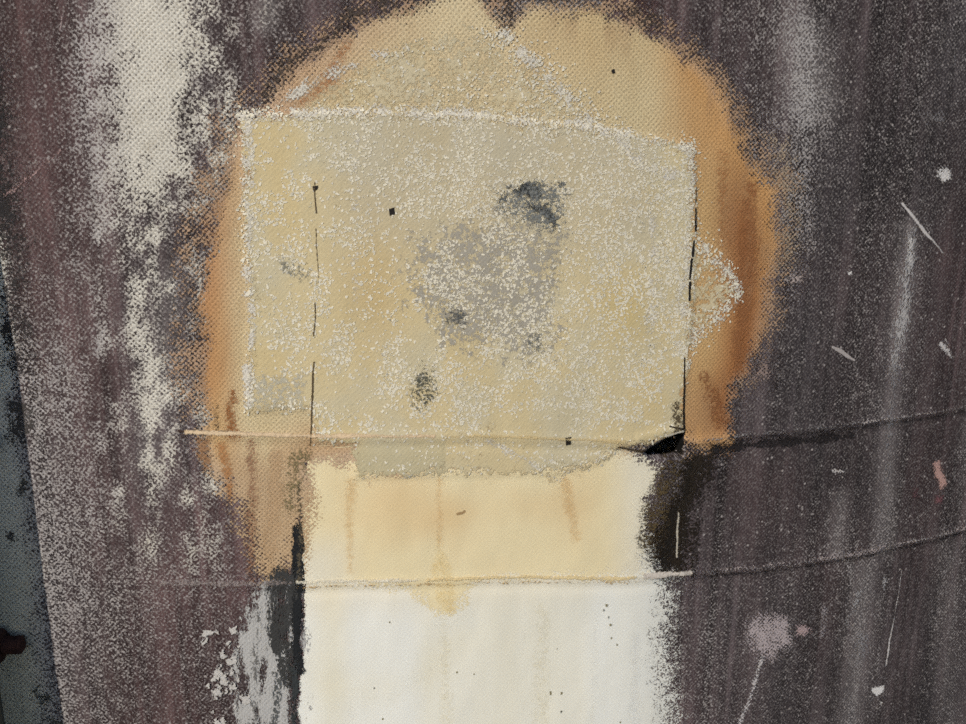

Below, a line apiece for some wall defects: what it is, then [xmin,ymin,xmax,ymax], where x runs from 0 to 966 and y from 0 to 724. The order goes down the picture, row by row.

crack [312,182,320,277]
damp [443,307,468,329]
rust [162,0,806,589]
peeling [230,22,744,485]
damp [492,180,570,233]
crack [688,187,697,301]
crack [308,362,316,447]
mould [409,360,438,411]
damp [230,440,719,724]
peeling [201,626,251,724]